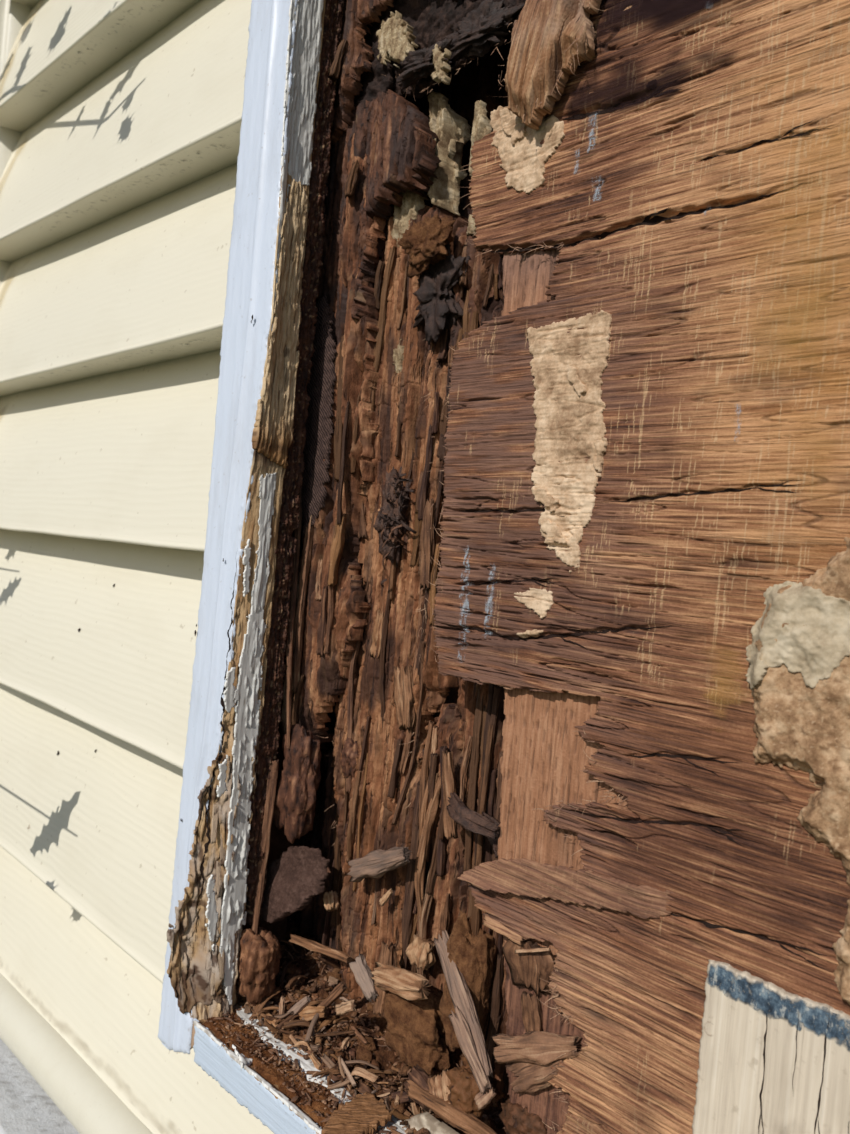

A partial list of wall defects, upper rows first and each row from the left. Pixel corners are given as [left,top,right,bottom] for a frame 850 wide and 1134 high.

spalling [391,26,565,219]
crack [459,478,807,517]
peeling [166,0,362,1134]
peeling [745,581,850,691]
spalling [434,687,459,725]
crack [628,753,739,777]
crack [578,811,778,850]
peeling [377,1115,413,1134]
crack [758,1015,767,1134]
crack [792,1008,830,1134]